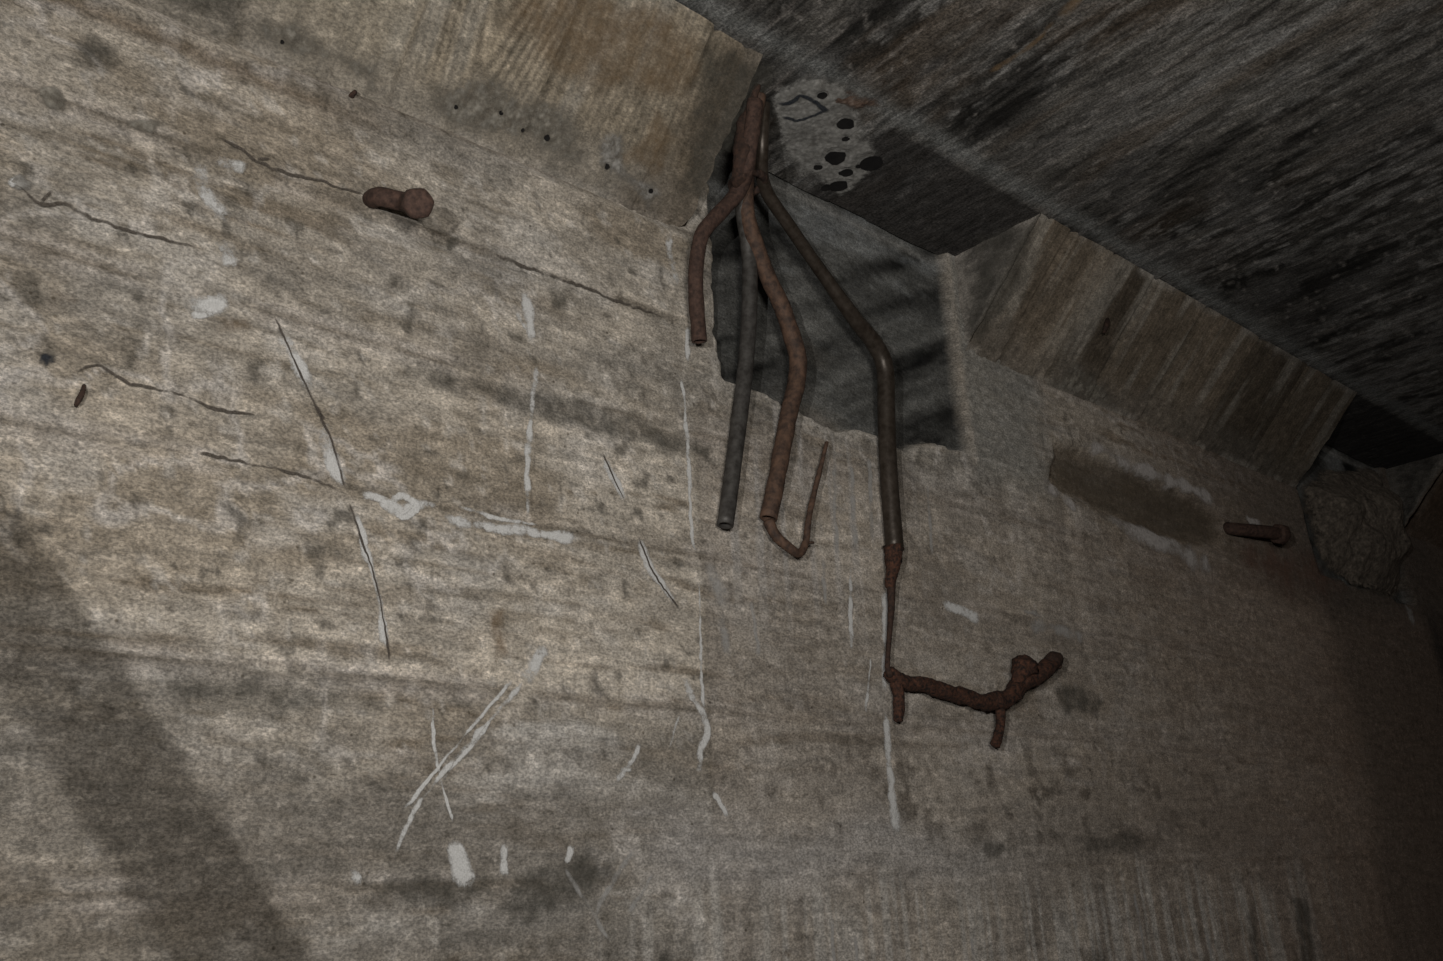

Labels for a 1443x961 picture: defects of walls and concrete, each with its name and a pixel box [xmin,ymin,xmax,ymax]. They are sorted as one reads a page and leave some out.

crack [223,139,362,194]
spalling [773,78,883,195]
crack [9,178,191,246]
crack [498,255,659,316]
crack [79,364,253,415]
rust [883,582,1064,748]